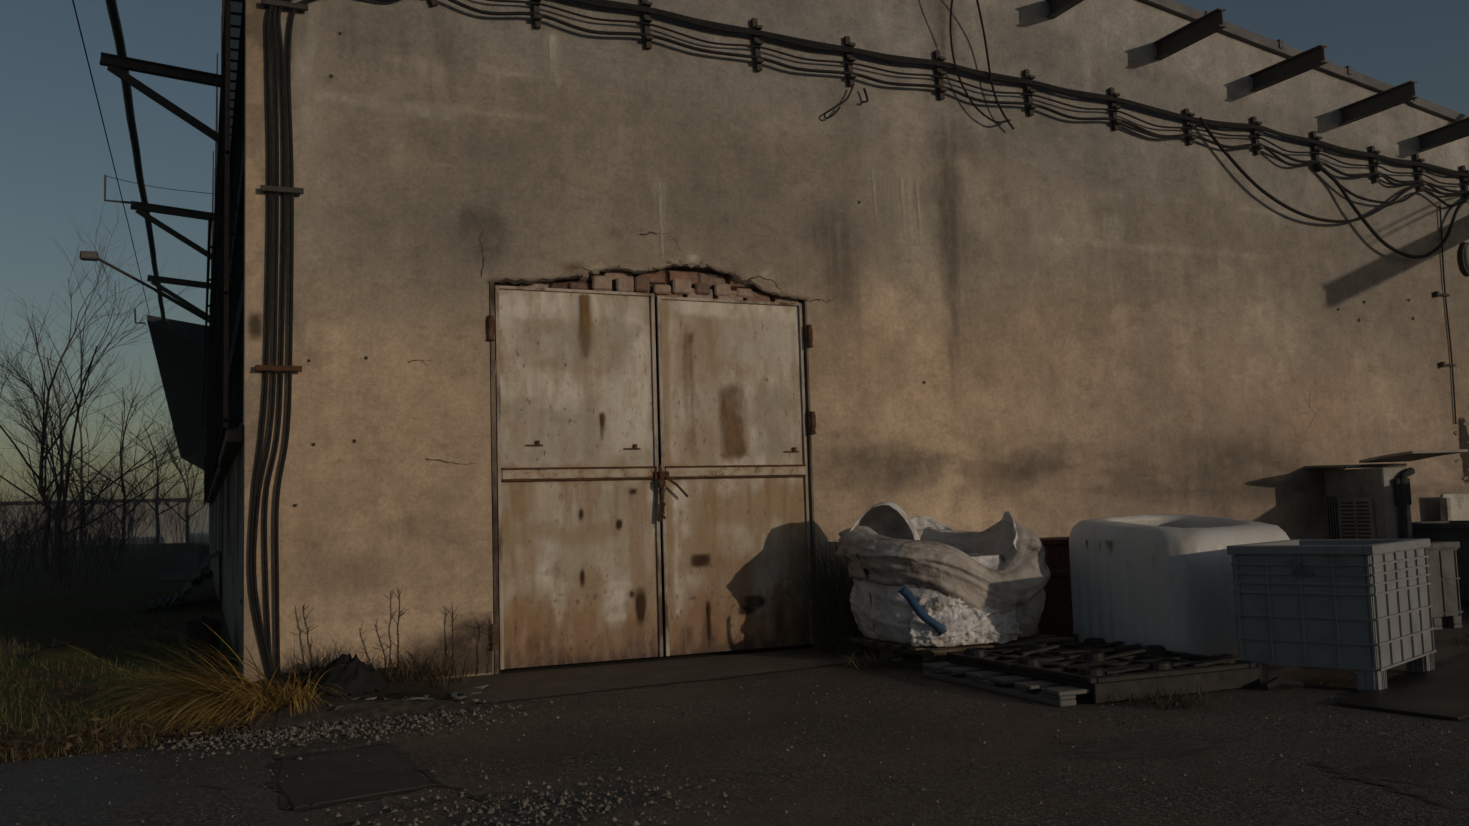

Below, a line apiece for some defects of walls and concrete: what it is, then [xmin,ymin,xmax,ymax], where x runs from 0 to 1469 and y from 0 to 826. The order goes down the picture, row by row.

spalling [494,254,801,303]